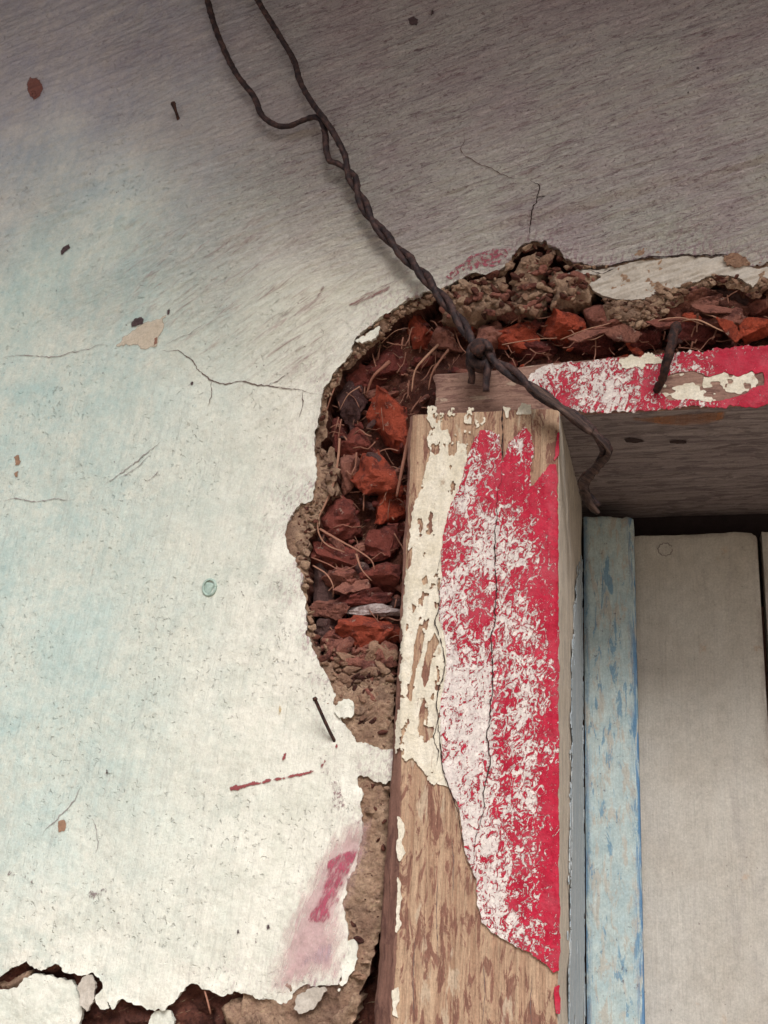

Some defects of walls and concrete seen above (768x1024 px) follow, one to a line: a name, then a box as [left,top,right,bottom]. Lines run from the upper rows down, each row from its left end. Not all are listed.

crack [460,139,545,232]
crack [591,254,726,274]
crack [6,344,108,358]
peeling [117,309,170,349]
crack [164,326,315,417]
spalling [285,242,768,750]
spalling [0,775,391,1024]